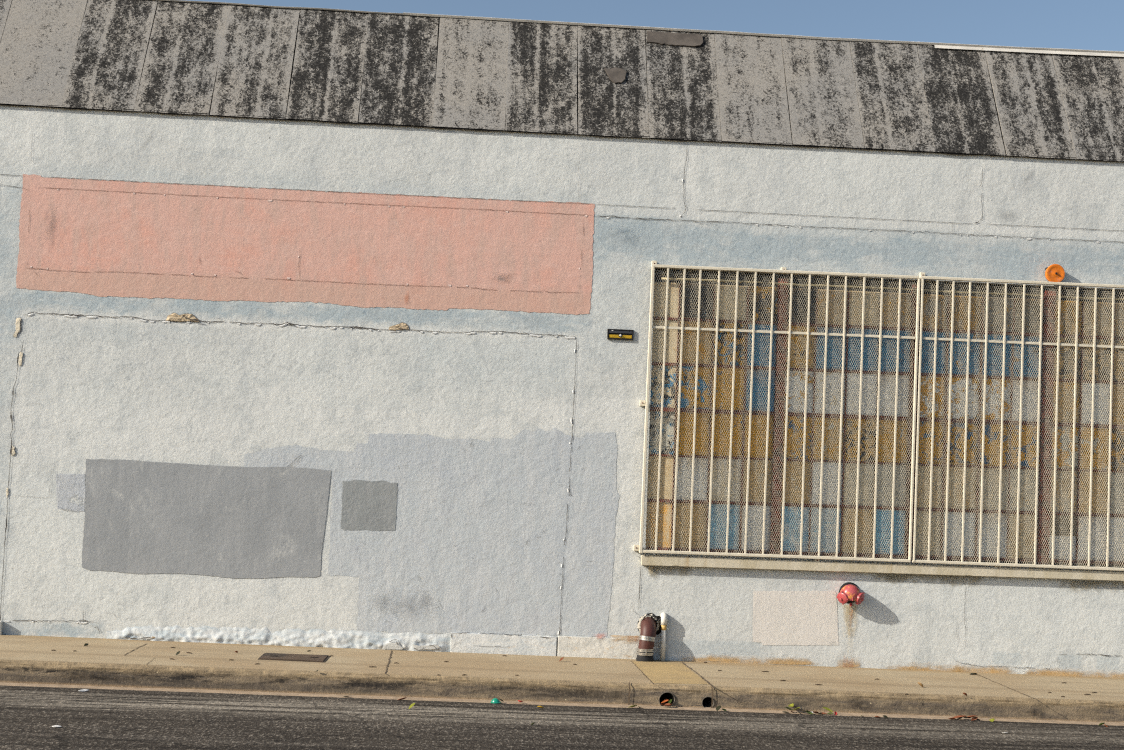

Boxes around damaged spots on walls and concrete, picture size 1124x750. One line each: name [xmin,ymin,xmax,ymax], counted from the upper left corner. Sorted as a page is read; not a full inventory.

crack [1,145,1120,293]
spalling [166,313,200,322]
spalling [388,322,409,331]